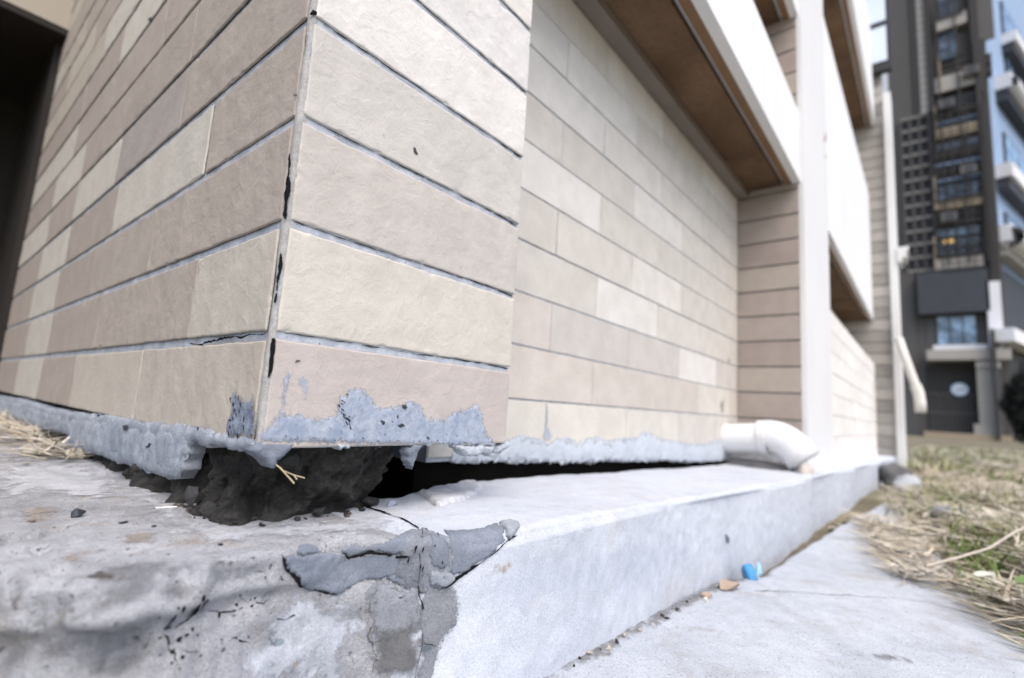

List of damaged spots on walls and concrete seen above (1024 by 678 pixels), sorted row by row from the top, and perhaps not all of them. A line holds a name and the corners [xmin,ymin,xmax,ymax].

crack [283,154,512,296]
crack [274,253,283,303]
crack [190,332,507,377]
peeling [285,531,410,595]
peeling [429,519,520,587]